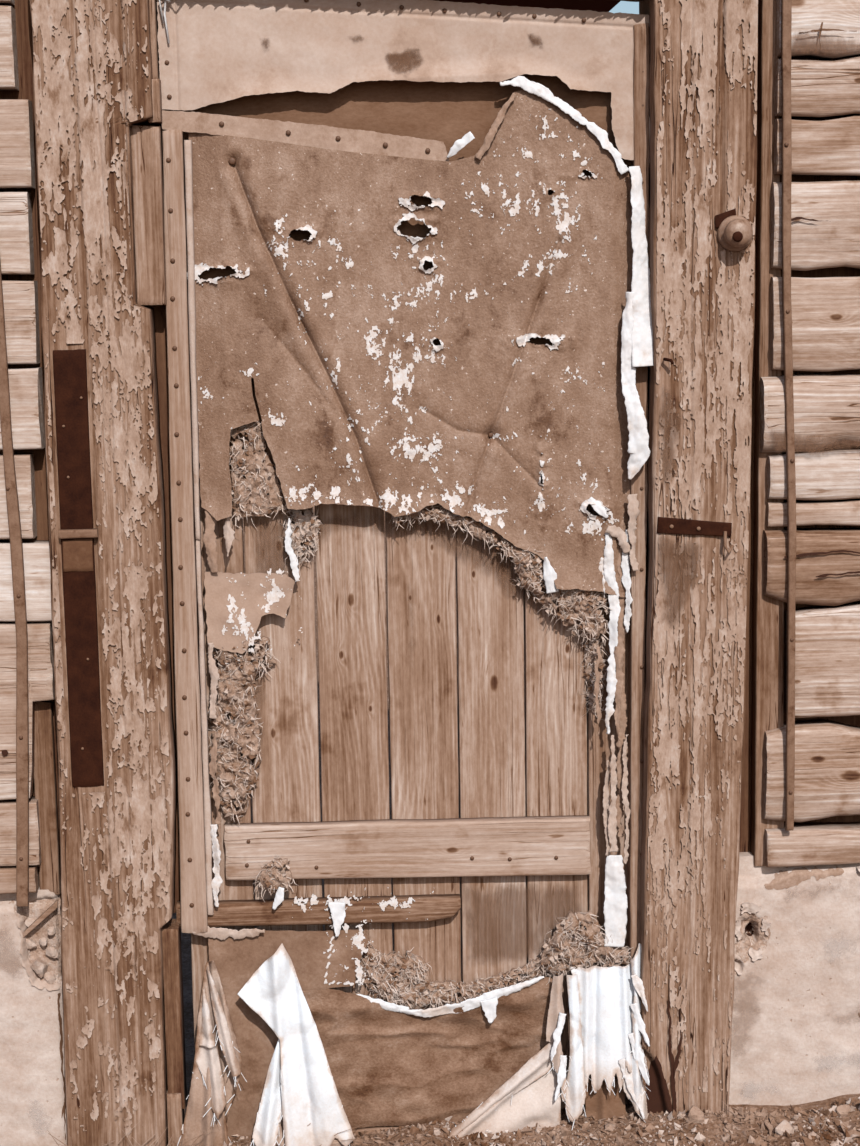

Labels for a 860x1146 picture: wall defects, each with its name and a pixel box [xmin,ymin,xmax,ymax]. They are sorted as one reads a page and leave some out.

peeling [14,0,171,1137]
peeling [292,892,415,922]
peeling [645,0,771,1093]